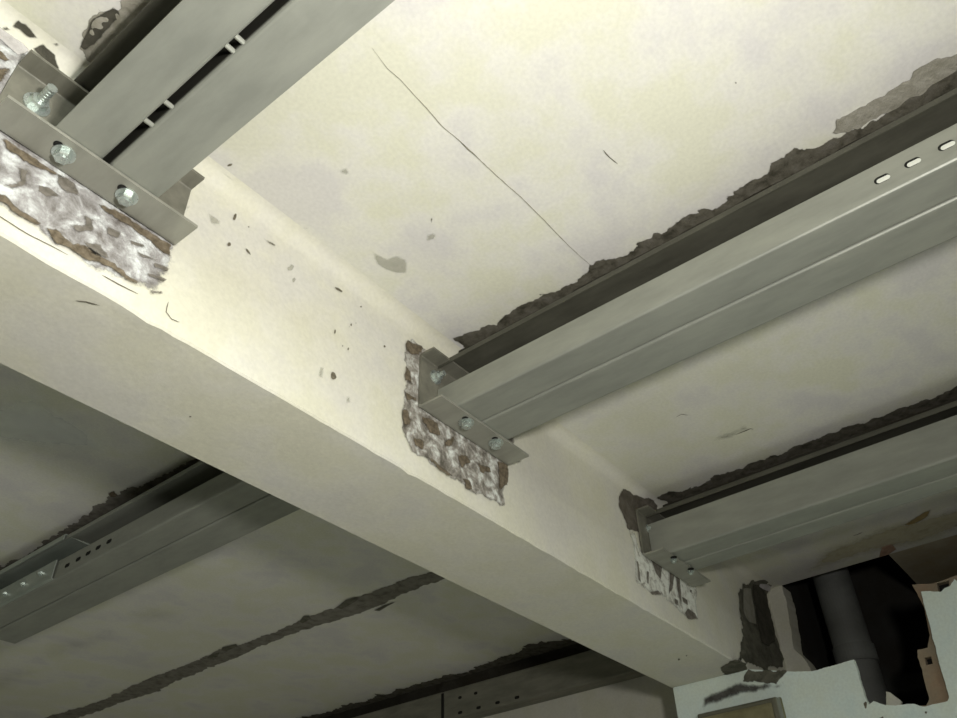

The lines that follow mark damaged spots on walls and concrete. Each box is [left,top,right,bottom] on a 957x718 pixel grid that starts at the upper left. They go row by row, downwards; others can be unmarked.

spalling [4,21,59,69]
spalling [80,0,151,62]
crack [372,48,589,264]
spalling [721,580,787,684]
spalling [302,639,578,718]